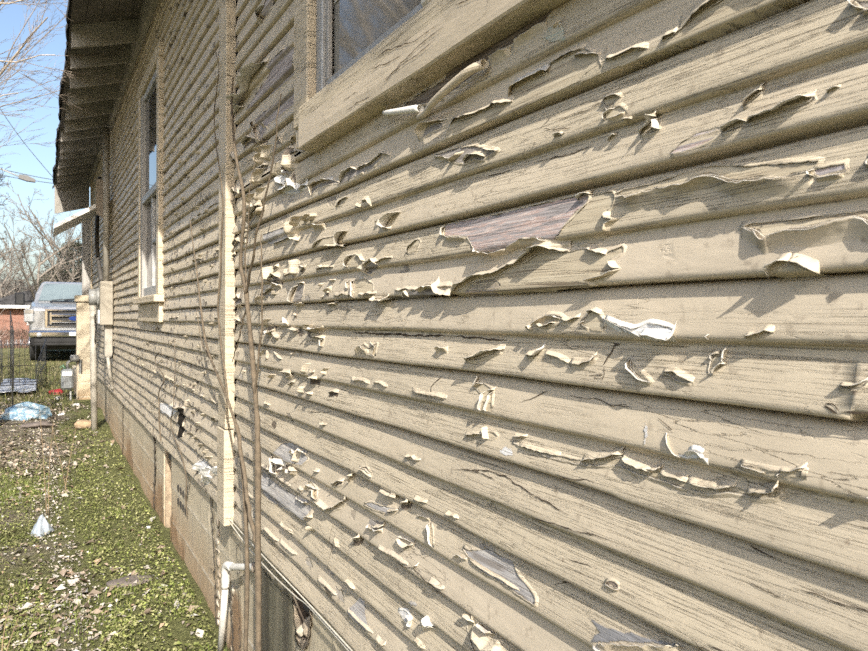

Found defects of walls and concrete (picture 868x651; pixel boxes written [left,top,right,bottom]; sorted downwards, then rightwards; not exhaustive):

crack [372,25,440,81]
peeling [385,0,783,166]
peeling [225,47,391,260]
peeling [242,156,868,395]
crack [823,403,868,414]
peeling [241,441,373,532]
peeling [350,486,434,547]
crack [454,469,607,540]
peeling [465,425,809,504]
spalling [292,584,313,651]
peeling [462,613,510,651]
crack [751,583,868,611]